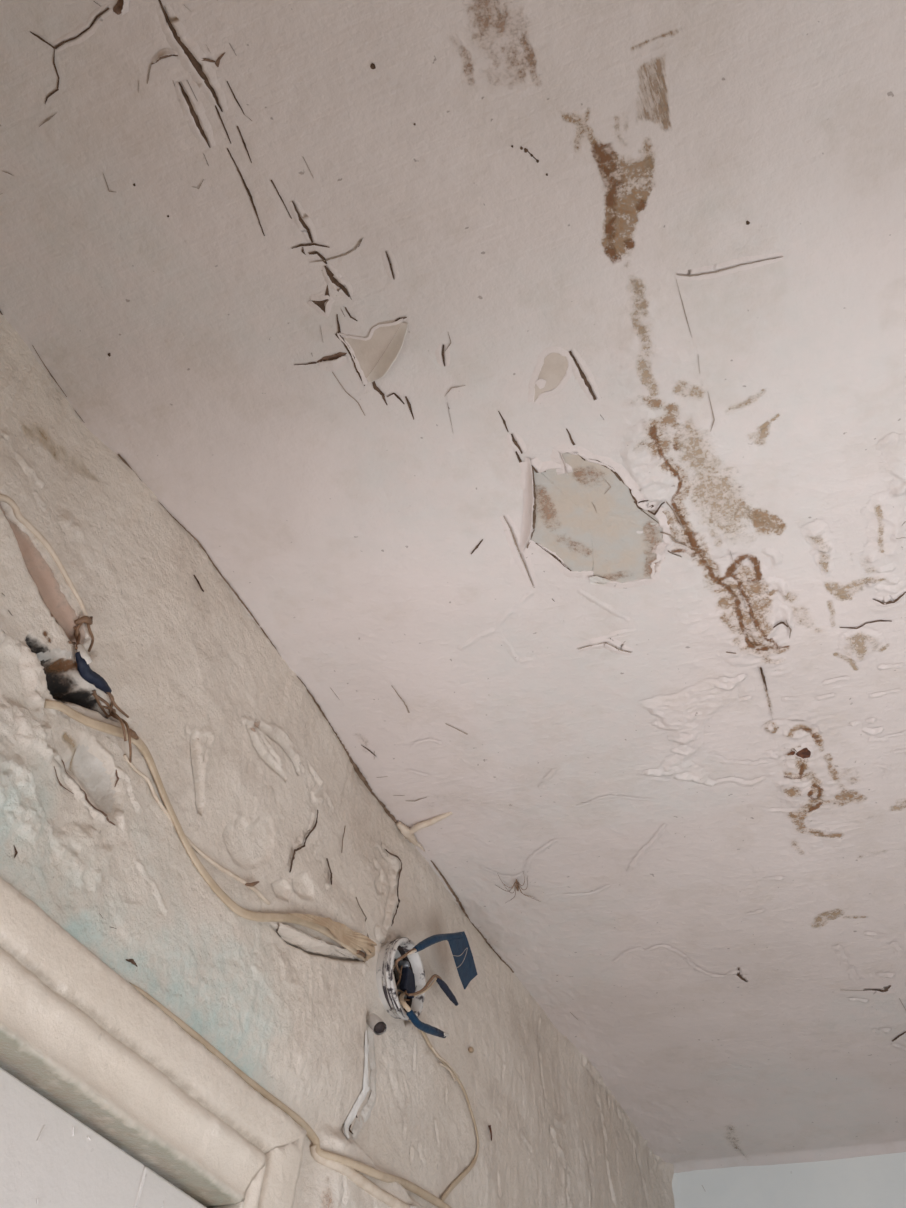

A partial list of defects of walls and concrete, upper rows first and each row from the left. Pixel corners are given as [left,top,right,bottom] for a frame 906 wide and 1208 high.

crack [30,1,112,127]
damp [472,0,508,36]
damp [502,36,537,78]
damp [641,59,670,129]
crack [156,0,399,339]
peeling [294,317,414,420]
peeling [528,346,572,404]
damp [633,281,657,396]
damp [750,414,779,444]
peeling [518,444,673,589]
damp [680,425,785,542]
damp [812,538,885,614]